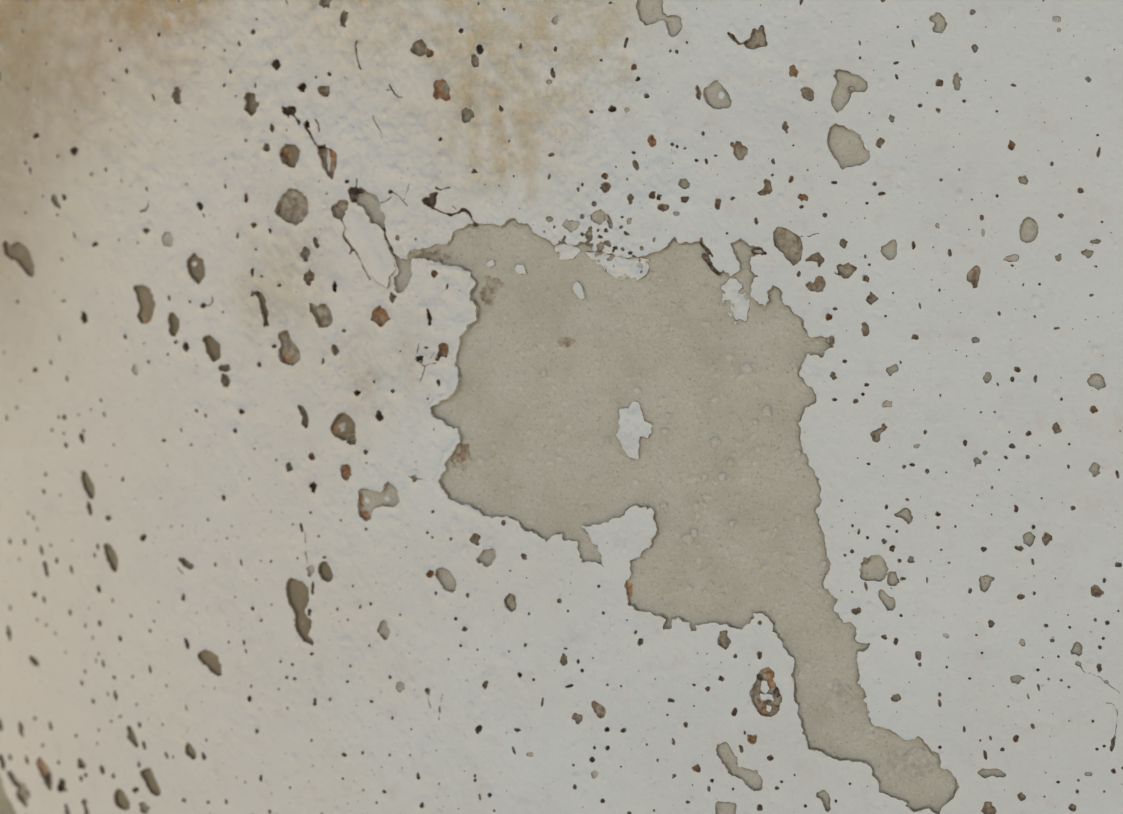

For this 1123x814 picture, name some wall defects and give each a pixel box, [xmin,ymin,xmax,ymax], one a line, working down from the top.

peeling [637,0,683,37]
peeling [827,70,884,169]
peeling [3,241,35,276]
peeling [331,173,959,814]
peeling [286,562,333,645]